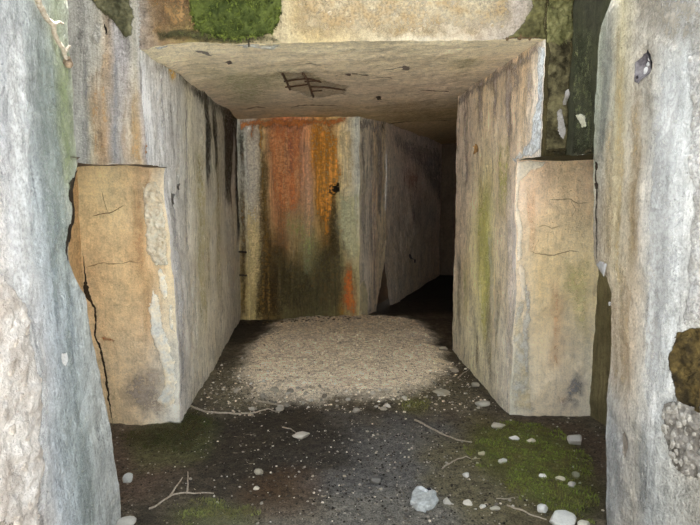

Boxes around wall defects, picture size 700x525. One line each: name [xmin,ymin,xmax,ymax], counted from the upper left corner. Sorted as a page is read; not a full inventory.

peeling [557,89,570,139]
damp [186,81,344,317]
rust [240,117,345,234]
crack [532,225,578,256]
crack [550,158,598,259]
crack [65,170,138,423]
rust [341,267,355,316]
spalling [661,401,700,480]